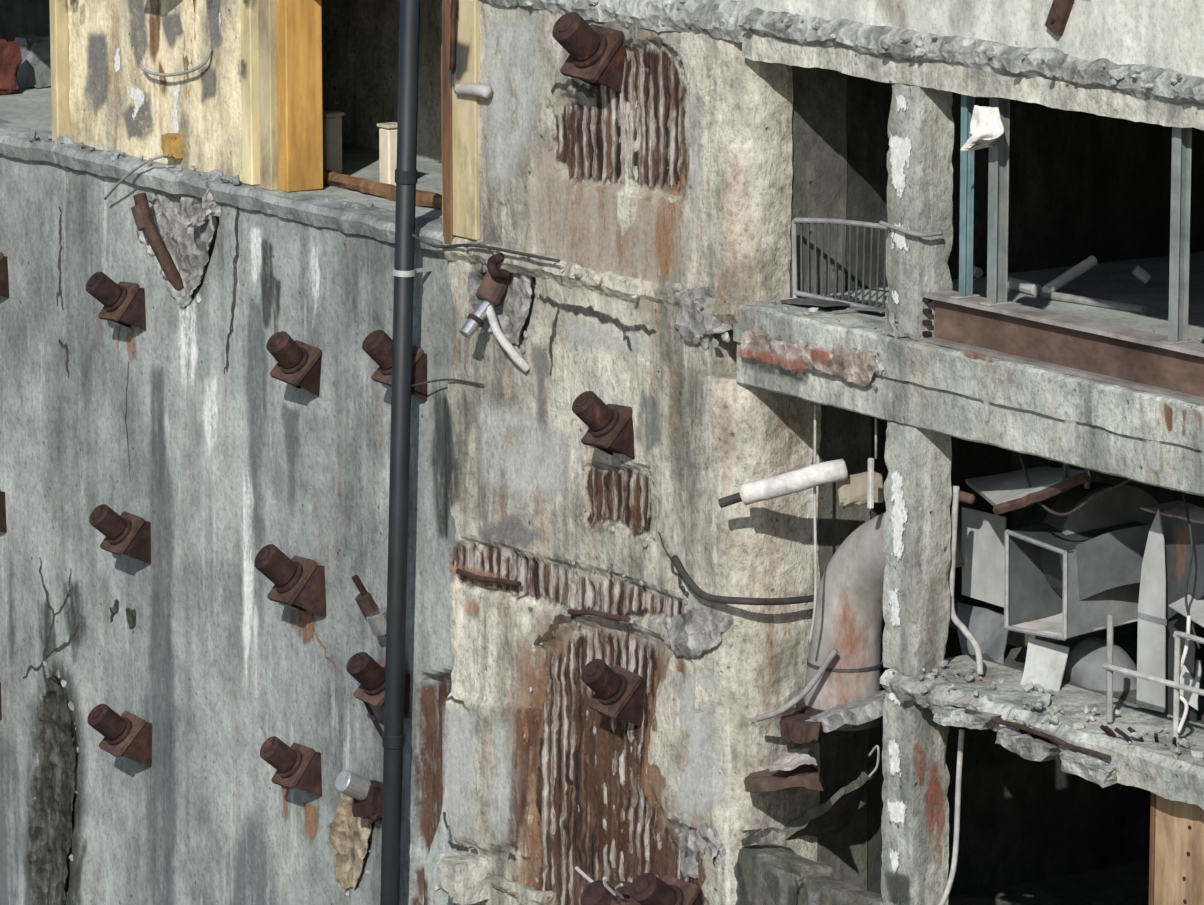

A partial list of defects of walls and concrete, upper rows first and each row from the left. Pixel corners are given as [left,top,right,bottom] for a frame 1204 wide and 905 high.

spalling [136,188,218,308]
corrosion [536,142,686,284]
spalling [546,45,692,203]
peeling [889,134,911,198]
crack [534,293,657,376]
spalling [674,282,884,389]
spalling [579,457,655,548]
peeling [891,471,908,561]
crack [23,557,81,684]
spalling [447,541,742,905]
spalling [964,709,1111,760]
spalling [329,793,379,896]